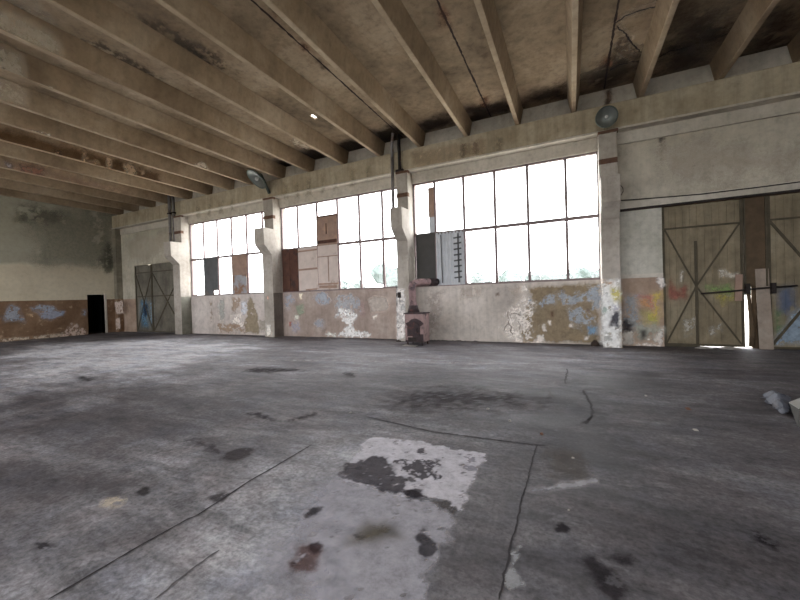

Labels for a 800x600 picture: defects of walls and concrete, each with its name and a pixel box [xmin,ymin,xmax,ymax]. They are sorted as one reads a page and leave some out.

crack [611,7,655,70]
peeling [5,305,55,320]
peeling [3,325,86,341]
peeling [210,298,270,335]
peeling [328,309,370,338]
peeling [369,289,405,339]
peeling [505,281,633,348]
crack [564,369,595,424]
peeling [262,437,486,600]